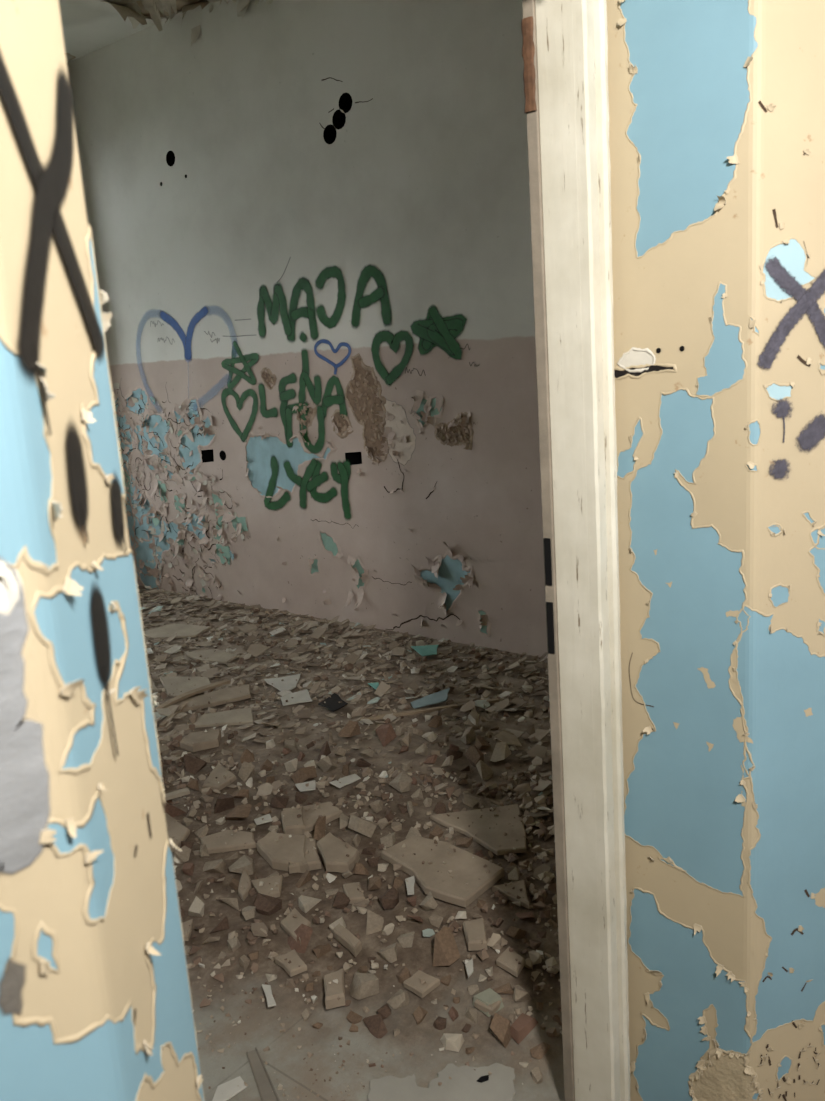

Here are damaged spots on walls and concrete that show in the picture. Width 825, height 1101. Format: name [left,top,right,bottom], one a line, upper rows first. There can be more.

peeling [100,0,273,46]
peeling [617,0,776,259]
peeling [760,209,816,303]
peeling [244,353,474,501]
peeling [0,223,250,806]
peeling [412,542,475,629]
peeling [614,281,825,1101]
peeling [38,783,116,926]
peeling [0,839,204,1101]